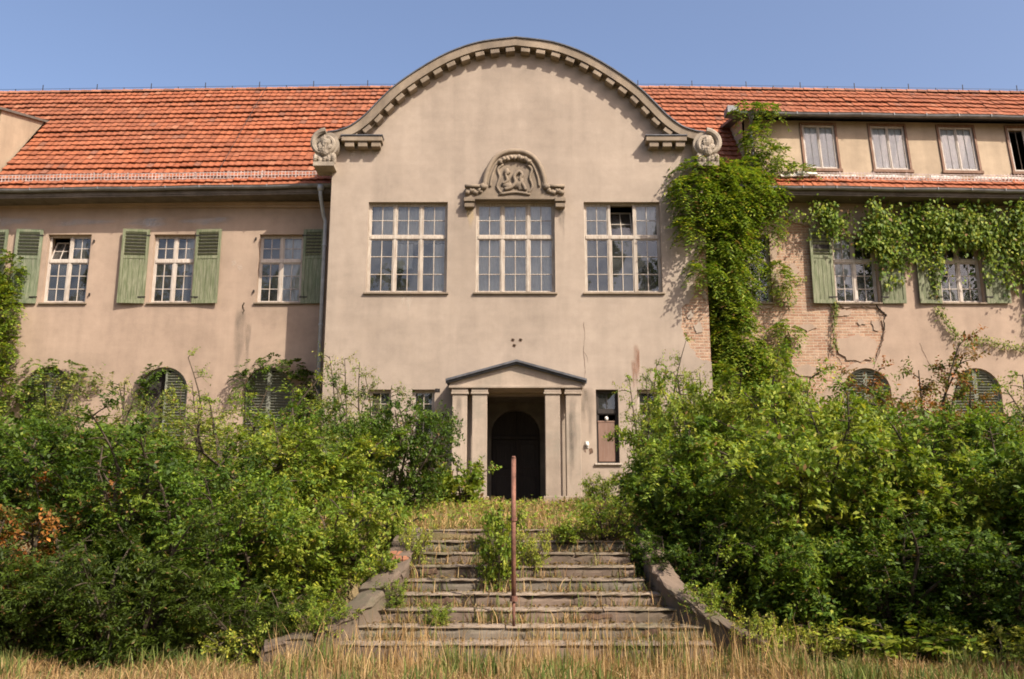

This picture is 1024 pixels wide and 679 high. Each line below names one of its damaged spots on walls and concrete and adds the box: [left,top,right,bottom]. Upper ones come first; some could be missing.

spalling [681,248,711,362]
spalling [725,221,885,397]
crack [873,304,887,368]